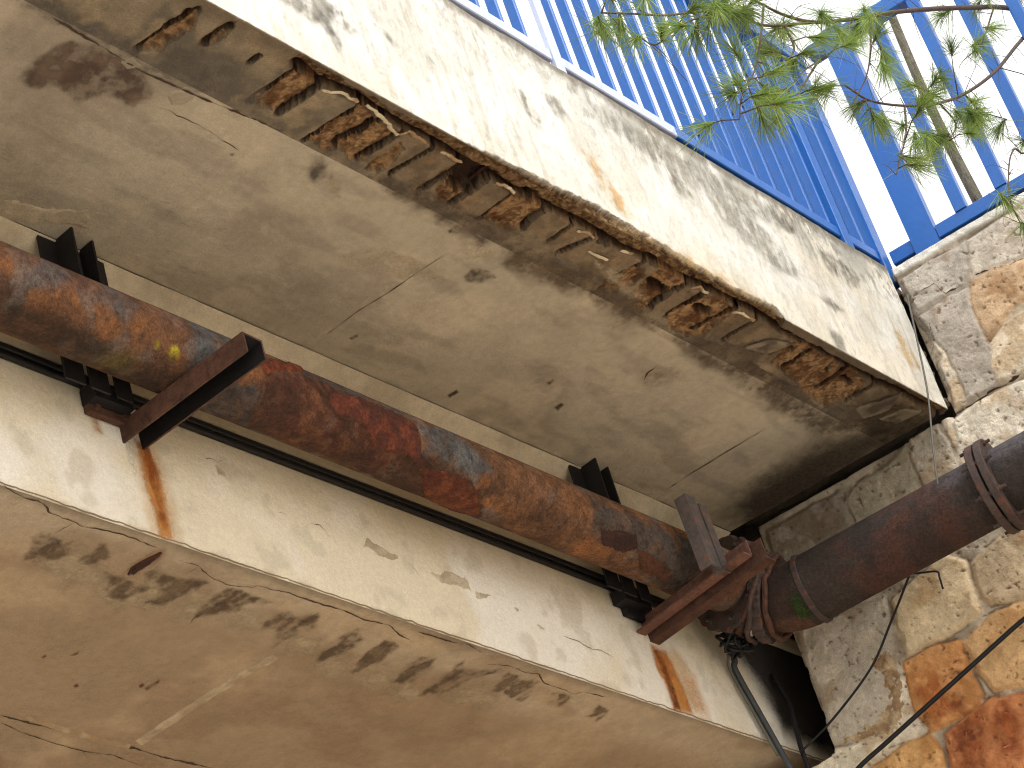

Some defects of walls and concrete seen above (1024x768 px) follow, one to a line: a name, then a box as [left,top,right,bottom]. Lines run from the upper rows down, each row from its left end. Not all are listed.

damp [26,4,145,103]
crack [54,18,267,150]
spalling [121,6,234,69]
peeling [253,54,947,424]
crack [3,485,160,549]
damp [25,538,259,617]
rust [138,444,172,538]
peeling [363,538,398,560]
peeling [431,571,491,599]
rust [652,647,703,712]